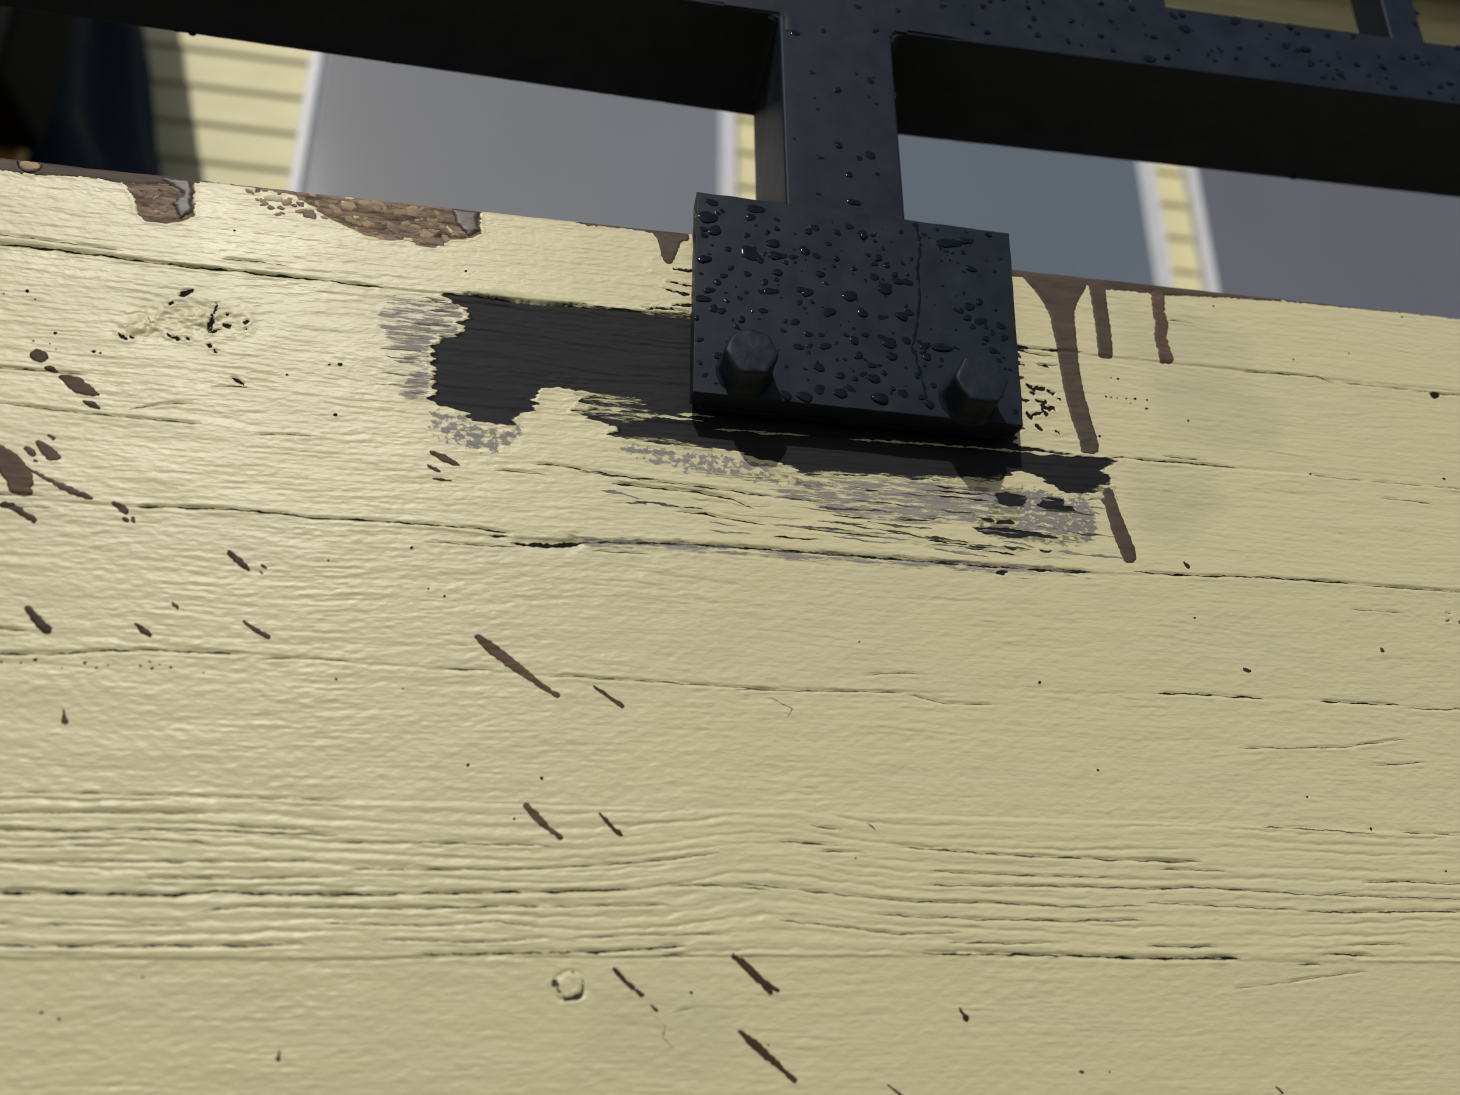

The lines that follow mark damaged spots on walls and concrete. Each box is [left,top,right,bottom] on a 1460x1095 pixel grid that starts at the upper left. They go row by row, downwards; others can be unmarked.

spalling [17,161,42,174]
peeling [124,177,196,224]
peeling [231,184,482,248]
peeling [376,268,1123,579]